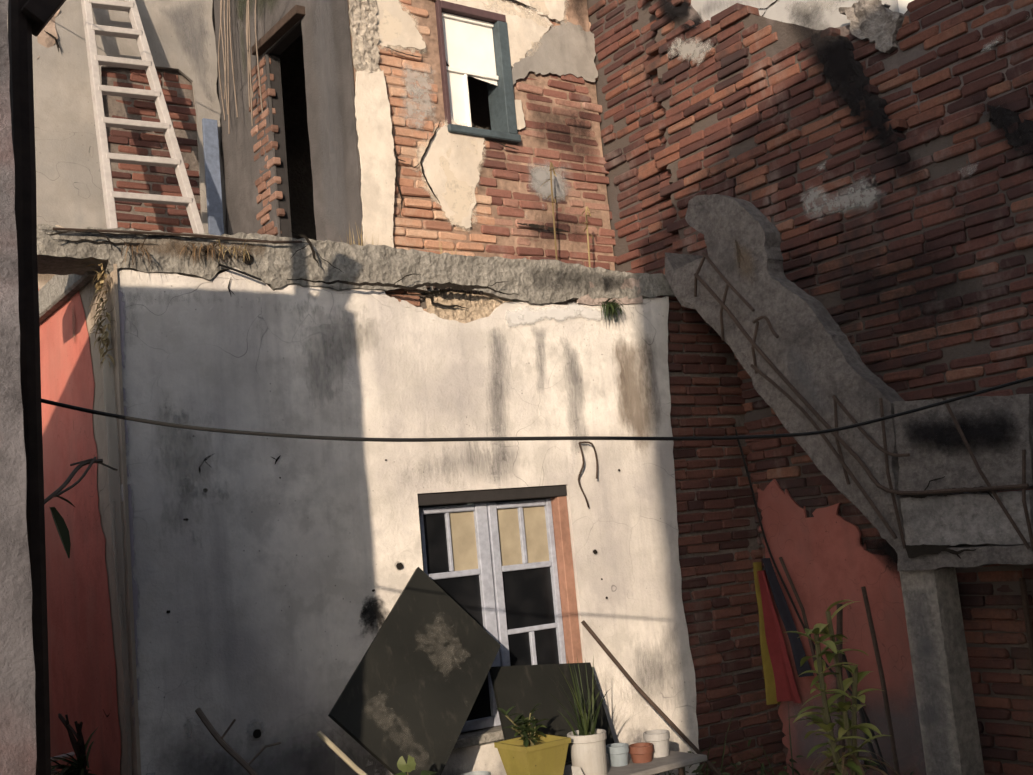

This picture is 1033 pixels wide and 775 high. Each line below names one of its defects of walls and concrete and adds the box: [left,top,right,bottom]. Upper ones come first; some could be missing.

water stain [616,345,651,437]
water stain [907,415,1012,451]
water stain [361,597,386,634]